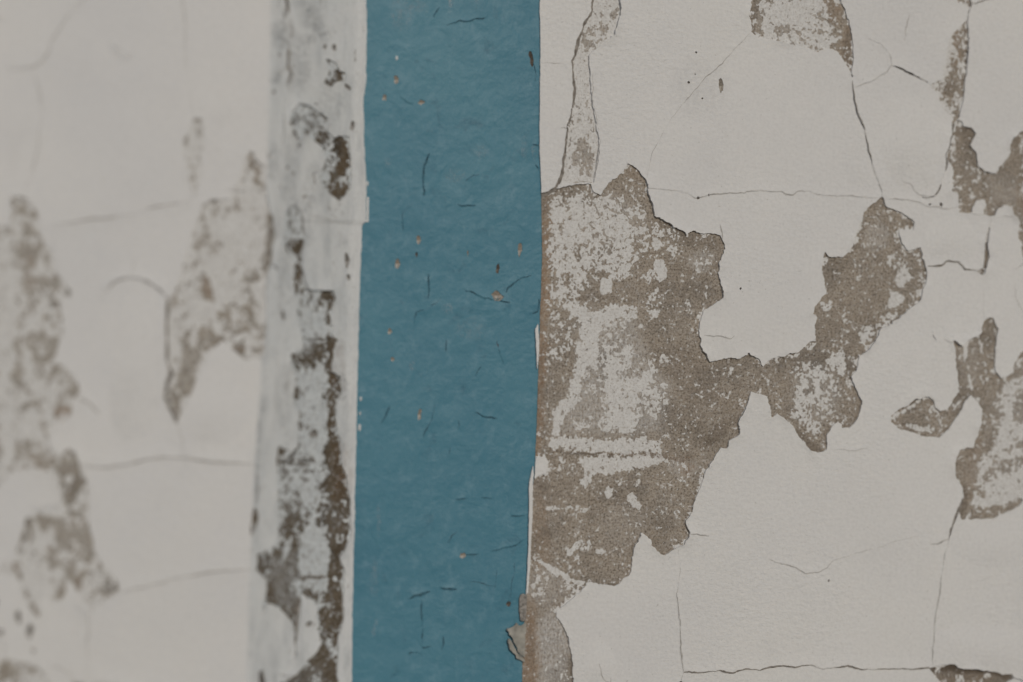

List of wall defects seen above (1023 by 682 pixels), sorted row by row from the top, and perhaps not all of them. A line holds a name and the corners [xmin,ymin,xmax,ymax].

crack [273,0,293,86]
peeling [289,103,354,201]
crack [533,0,601,196]
crack [646,15,957,209]
peeling [931,0,1023,254]
peeling [0,196,120,639]
crack [107,261,178,423]
peeling [167,151,350,682]
peeling [506,0,927,682]
crack [928,260,978,271]
peeling [891,318,1023,520]
crack [676,499,963,680]